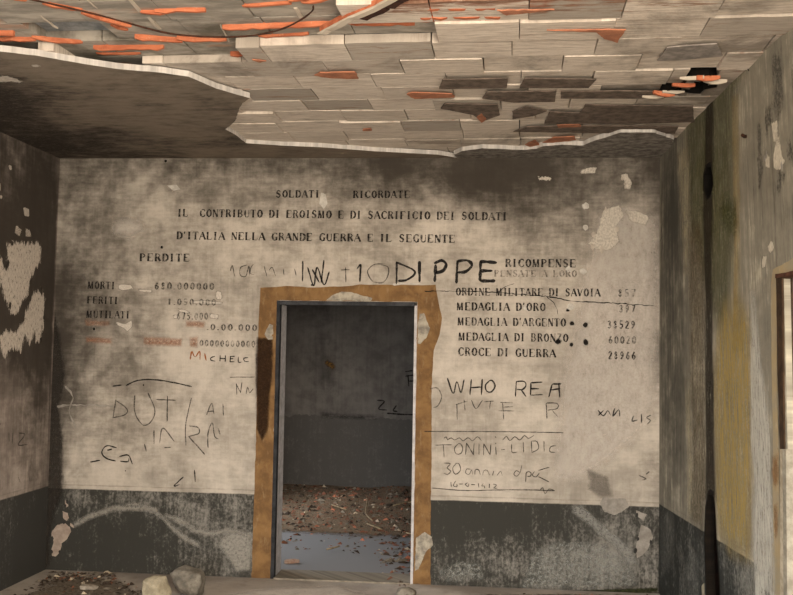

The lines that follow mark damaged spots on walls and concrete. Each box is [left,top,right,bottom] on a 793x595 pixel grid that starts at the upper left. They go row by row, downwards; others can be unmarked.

spalling [317,0,409,35]
peeling [497,8,554,16]
peeling [547,28,626,43]
peeling [314,71,359,79]
peeling [525,124,581,147]
peeling [757,56,793,193]
peeling [621,173,632,189]
peeling [583,205,648,254]
peeling [0,226,45,358]
peeling [49,500,74,557]